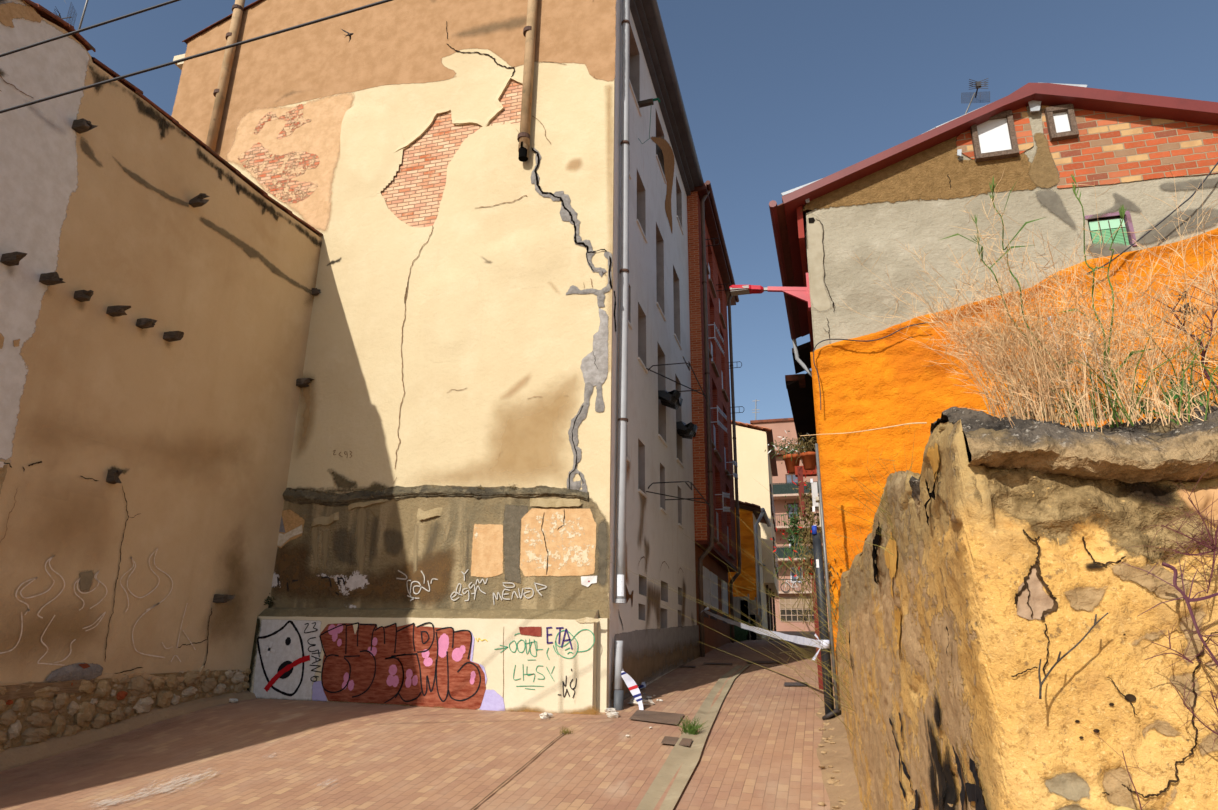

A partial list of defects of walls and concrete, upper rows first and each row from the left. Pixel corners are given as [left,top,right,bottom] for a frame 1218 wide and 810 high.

leakage [118,162,189,207]
leakage [133,95,322,247]
leakage [201,218,316,300]
flaking render [381,75,523,228]
flaking render [1012,105,1218,188]
crack [393,225,433,484]
crack [479,116,616,575]
leakage [479,390,569,476]
crack [81,476,142,674]
flaking render [520,498,597,576]
flaking render [974,467,1218,620]
crack [1102,632,1218,798]